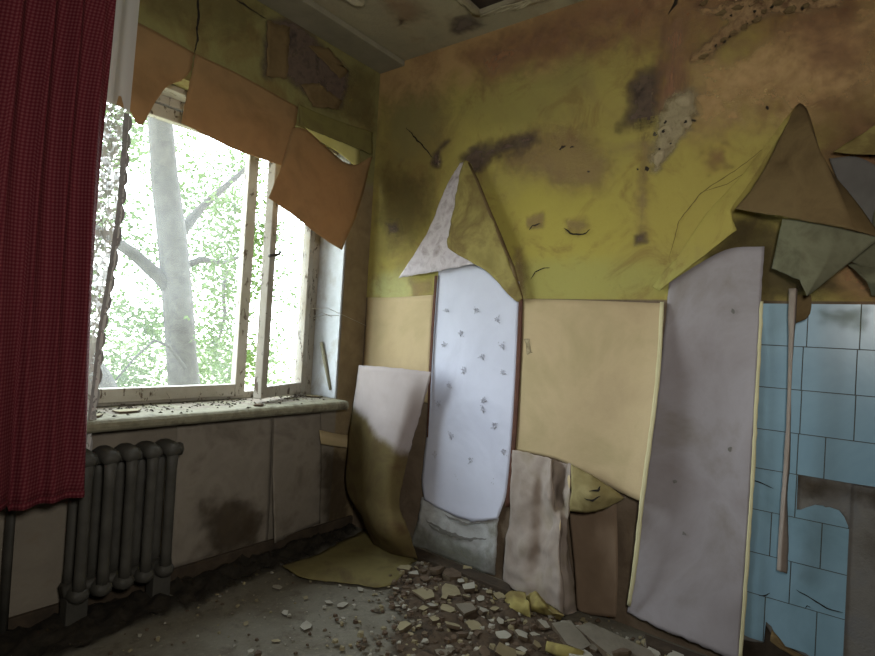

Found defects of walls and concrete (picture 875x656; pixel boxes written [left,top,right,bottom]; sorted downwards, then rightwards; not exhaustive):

peeling [116,18,373,250]
leakage [461,134,600,182]
flaking render [637,65,698,172]
leakage [697,5,875,119]
peeling [797,475,875,656]
flaking render [742,622,809,656]